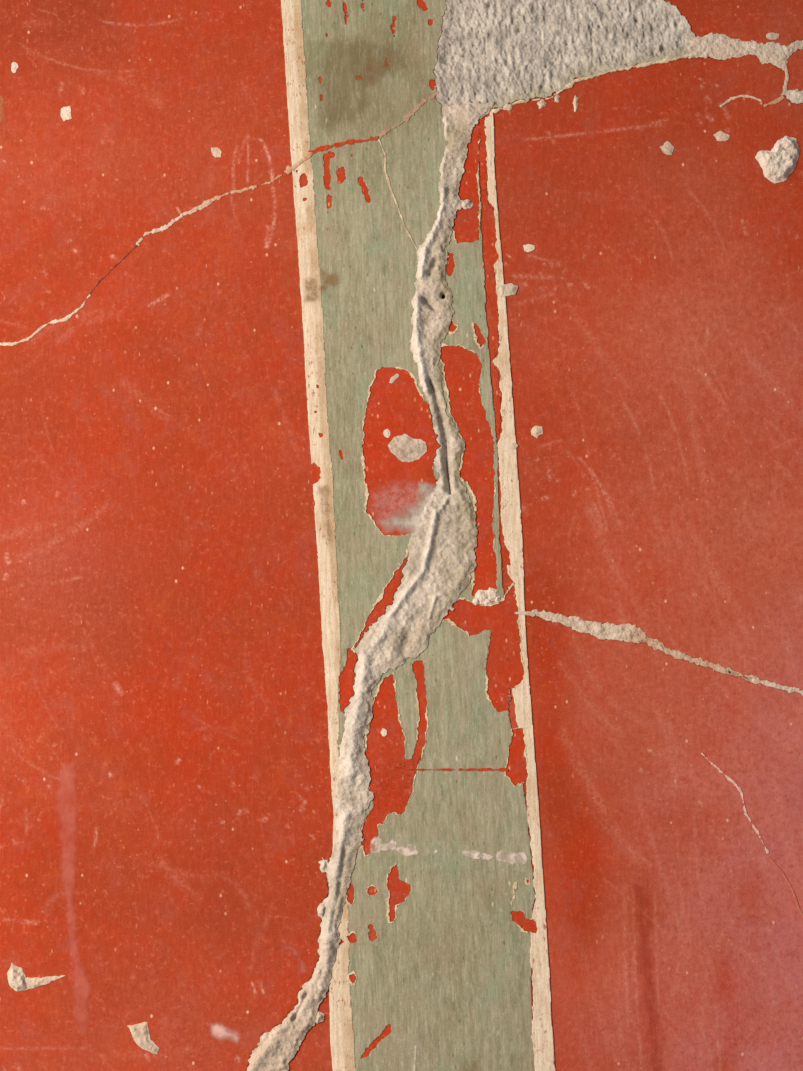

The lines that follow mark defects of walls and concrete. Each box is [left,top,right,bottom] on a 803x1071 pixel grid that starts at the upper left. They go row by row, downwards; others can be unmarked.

crack [686,32,803,107]
spalling [417,0,696,712]
peeling [361,367,440,537]
crack [0,91,508,1071]
peeling [339,549,409,712]
crack [515,609,803,695]
peeling [346,864,411,924]
peeling [360,660,429,856]
peeling [504,728,528,787]
crack [701,753,803,916]
spalling [7,963,66,991]
spalling [128,1022,160,1054]